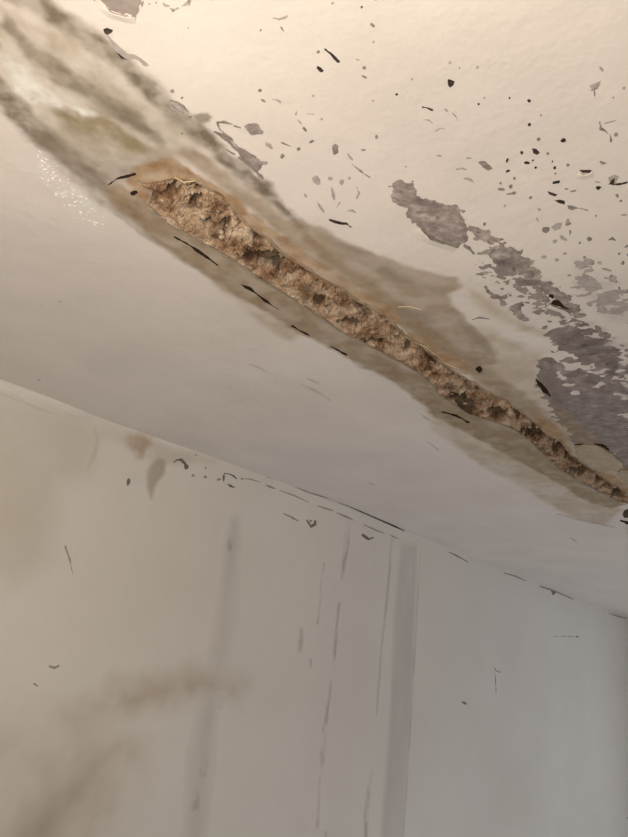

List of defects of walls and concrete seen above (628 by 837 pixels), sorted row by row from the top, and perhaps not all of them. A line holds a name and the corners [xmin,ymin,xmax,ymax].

peeling [93,0,191,66]
peeling [169,89,273,179]
peeling [332,144,370,178]
peeling [456,157,493,182]
damp [0,0,628,535]
spalling [108,171,628,524]
crack [504,573,573,600]